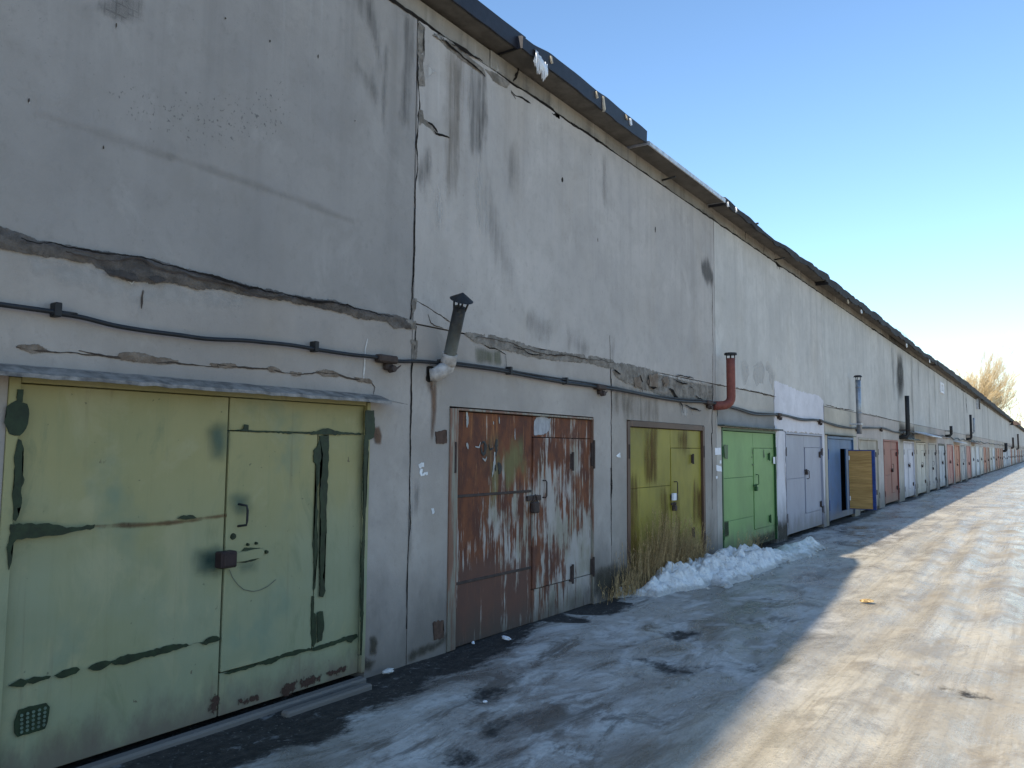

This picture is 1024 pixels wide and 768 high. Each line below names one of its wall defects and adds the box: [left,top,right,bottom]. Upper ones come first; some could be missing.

flaking render [0,226,411,329]
crack [390,0,472,629]
water stain [702,262,713,282]
crack [492,68,975,408]
peeling [16,339,375,394]
flaking render [465,332,714,415]